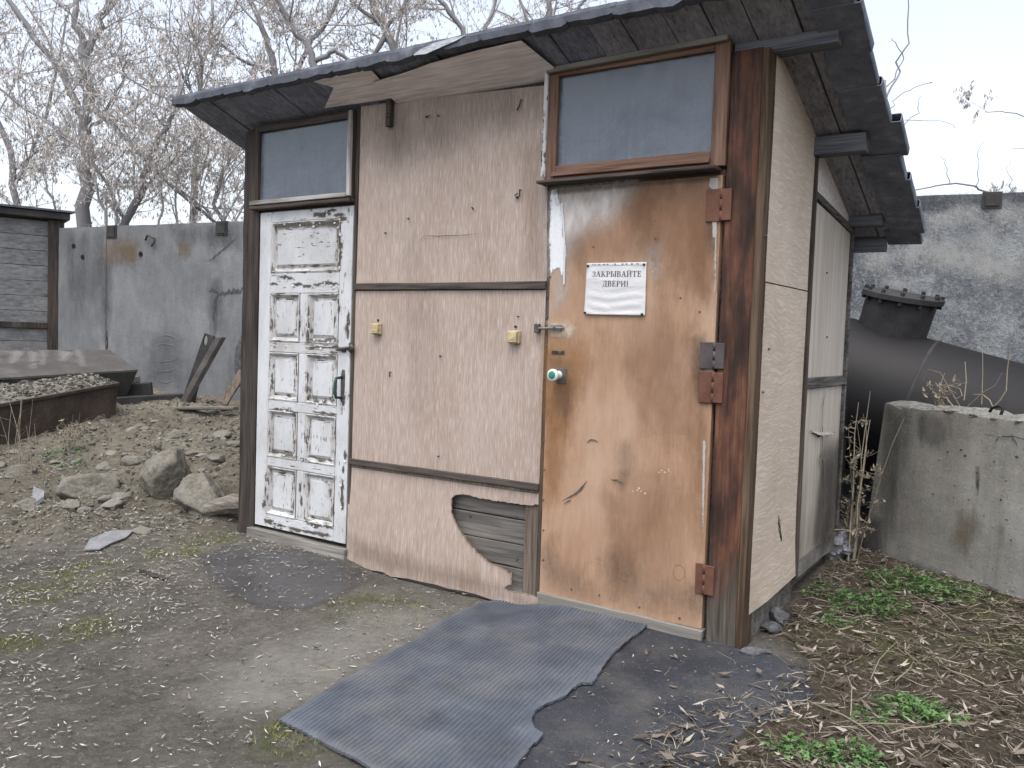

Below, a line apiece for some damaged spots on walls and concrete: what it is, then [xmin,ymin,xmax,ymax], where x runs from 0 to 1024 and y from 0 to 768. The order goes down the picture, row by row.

peeling [270,209,348,288]
peeling [549,180,638,284]
peeling [297,306,350,350]
peeling [305,372,345,417]